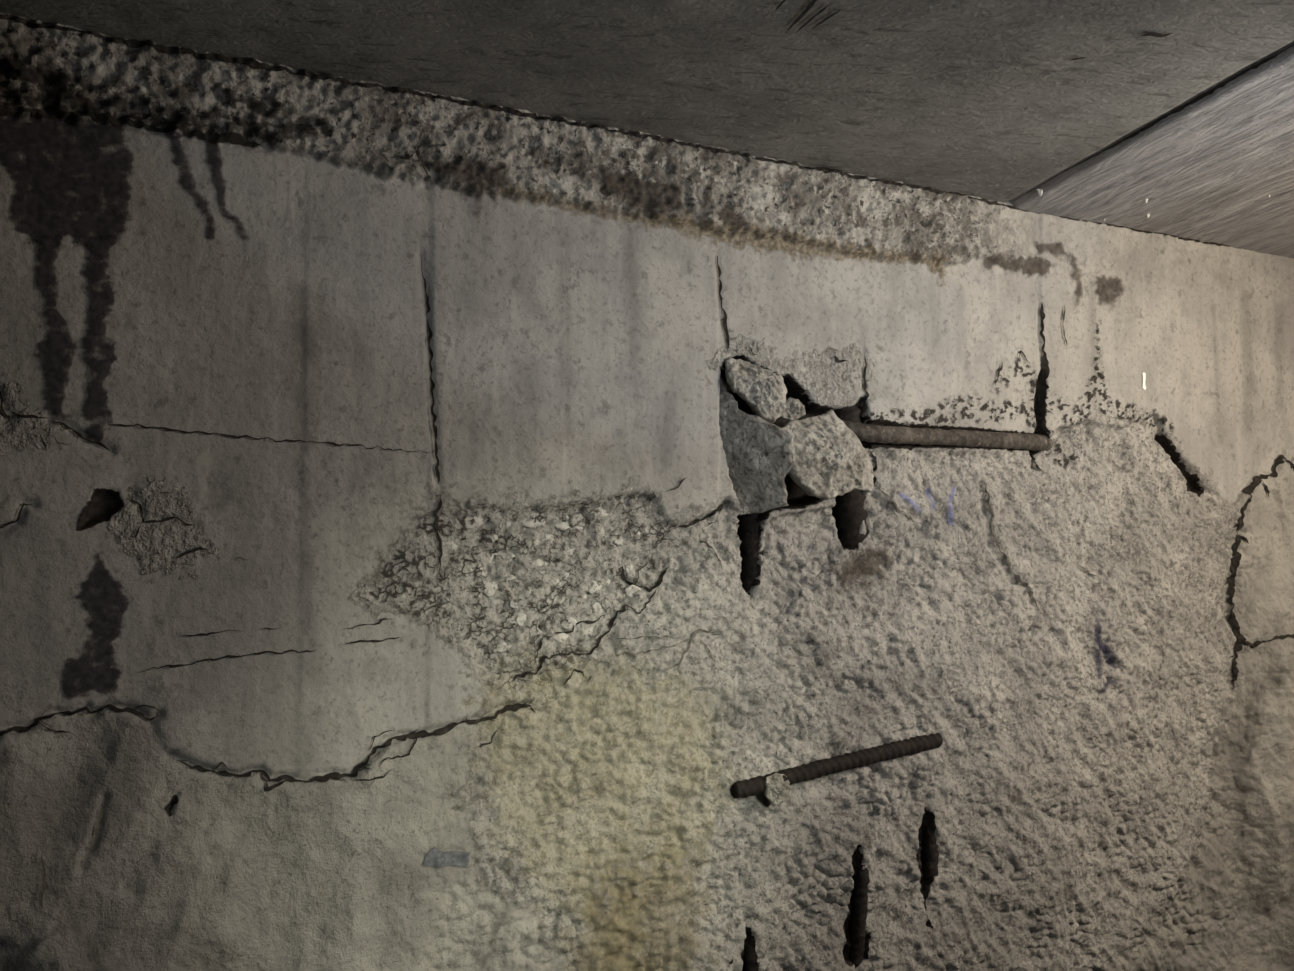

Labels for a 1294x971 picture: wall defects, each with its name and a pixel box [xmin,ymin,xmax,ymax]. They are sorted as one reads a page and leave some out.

water stain [0,53,333,442]
crack [0,253,730,791]
spalling [348,323,1244,971]
crack [869,449,913,521]
crack [984,487,1038,608]
crack [995,303,1067,473]
crack [1225,454,1294,690]
corrosion [730,733,943,798]